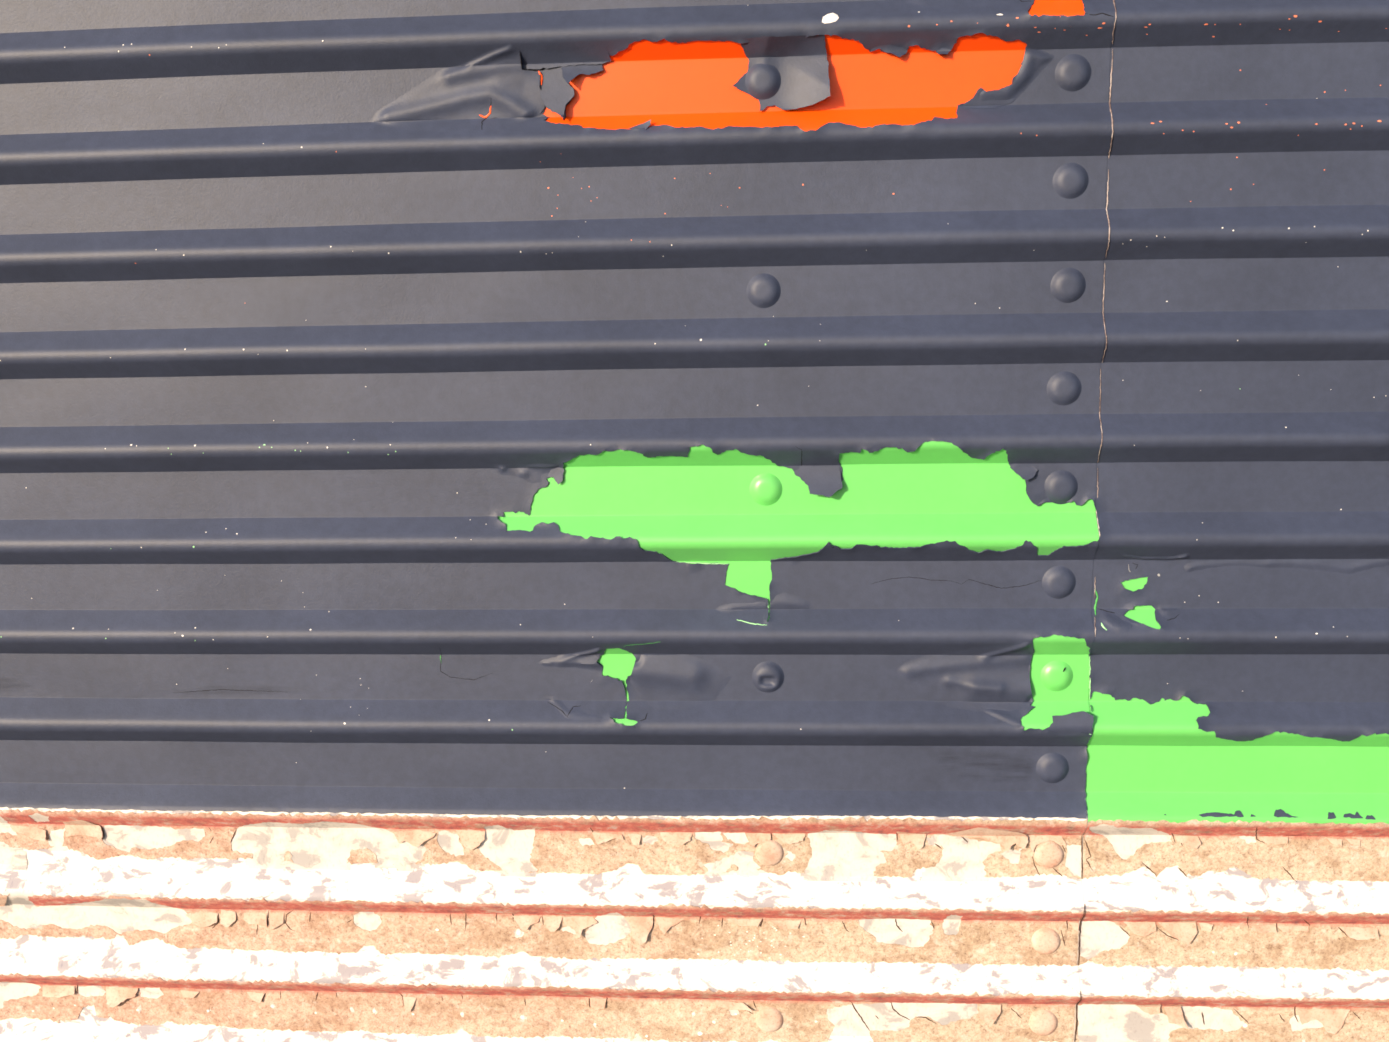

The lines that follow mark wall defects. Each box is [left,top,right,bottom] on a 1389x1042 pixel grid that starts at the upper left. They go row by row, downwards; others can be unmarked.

peeling [526,0,1114,131]
crack [1097,0,1117,498]
peeling [497,441,1099,625]
peeling [579,635,1389,882]
peeling [0,809,213,870]
peeling [230,821,539,877]
peeling [0,889,294,938]
peeling [496,912,806,959]
peeling [842,915,962,948]
peeling [0,982,199,1013]
peeling [815,1001,1021,1036]
peeling [1073,1004,1249,1042]